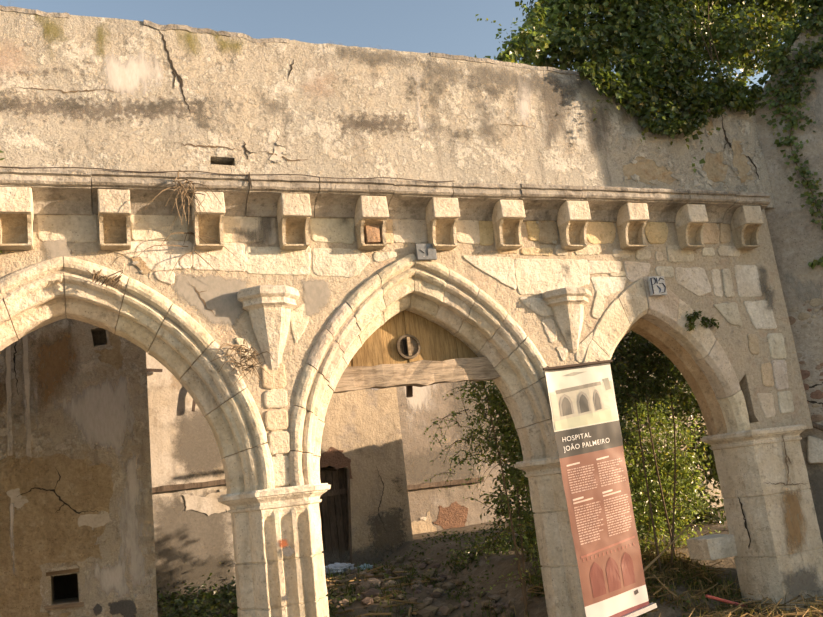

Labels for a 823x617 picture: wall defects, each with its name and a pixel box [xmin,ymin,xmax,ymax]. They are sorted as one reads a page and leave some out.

damp [0,54,210,128]
crack [159,30,191,112]
damp [339,61,580,138]
crack [722,116,760,180]
damp [23,333,134,454]
crack [17,469,97,514]
peeling [0,451,114,617]
damp [95,456,145,598]
damp [153,500,235,607]
damp [173,411,222,478]
crack [737,491,751,548]
crack [767,435,807,485]